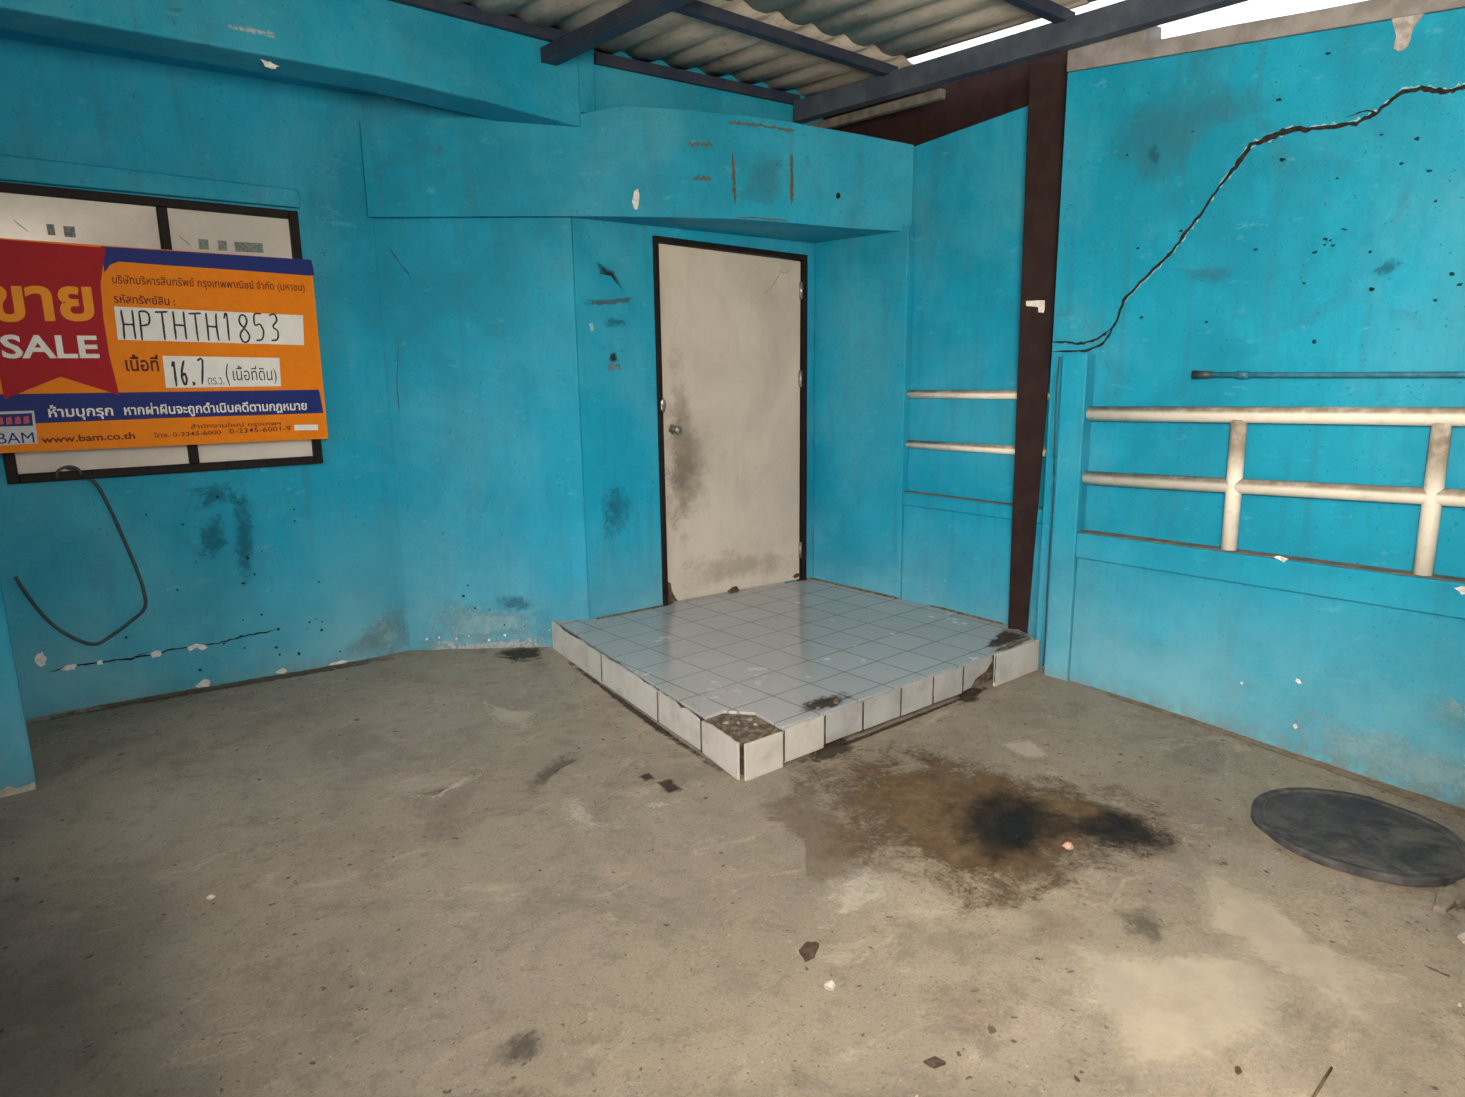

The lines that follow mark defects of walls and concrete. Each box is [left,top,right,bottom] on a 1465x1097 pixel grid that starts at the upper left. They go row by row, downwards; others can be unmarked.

crack [1050,82,1465,352]
crack [49,630,274,673]
spalling [710,717,778,748]
spalling [1433,878,1465,914]